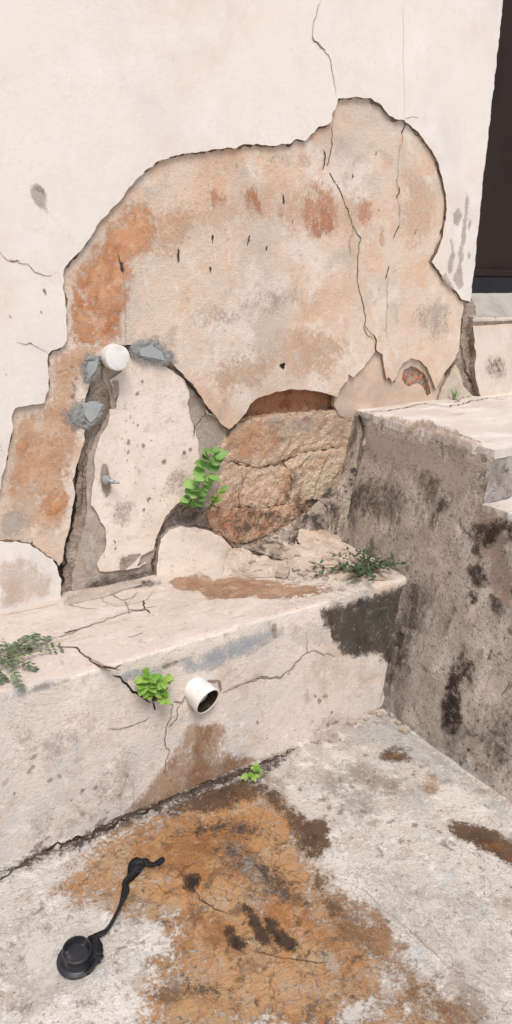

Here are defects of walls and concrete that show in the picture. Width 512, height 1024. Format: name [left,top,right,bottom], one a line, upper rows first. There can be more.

crack [312,1,337,96]
spalling [126,97,354,192]
crack [1,254,57,276]
peeling [30,184,47,209]
crack [323,124,389,352]
peeling [100,464,111,496]
spalling [206,352,445,543]
peeling [84,531,141,572]
crack [0,433,301,882]
crack [207,634,334,693]
leakage [86,412,512,824]
leakage [52,723,512,1024]